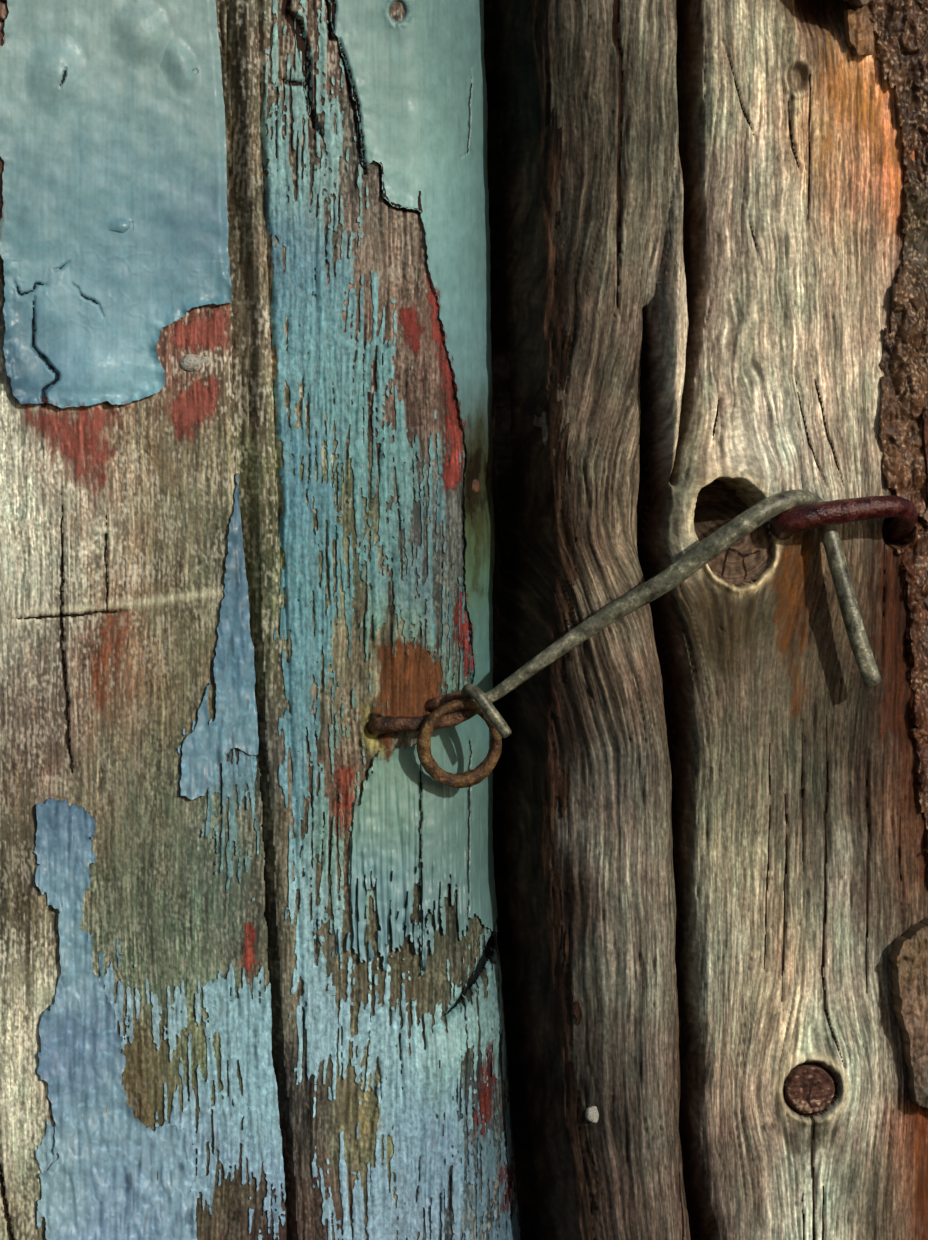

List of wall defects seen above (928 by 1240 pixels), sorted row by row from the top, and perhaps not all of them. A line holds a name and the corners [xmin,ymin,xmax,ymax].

crack [279,0,423,214]
crack [16,263,67,407]
crack [18,492,122,774]
peeling [177,473,259,892]
corrosion [381,731,398,761]
peeling [260,0,520,1240]
corrosion [372,639,446,717]
peeling [33,798,286,1240]